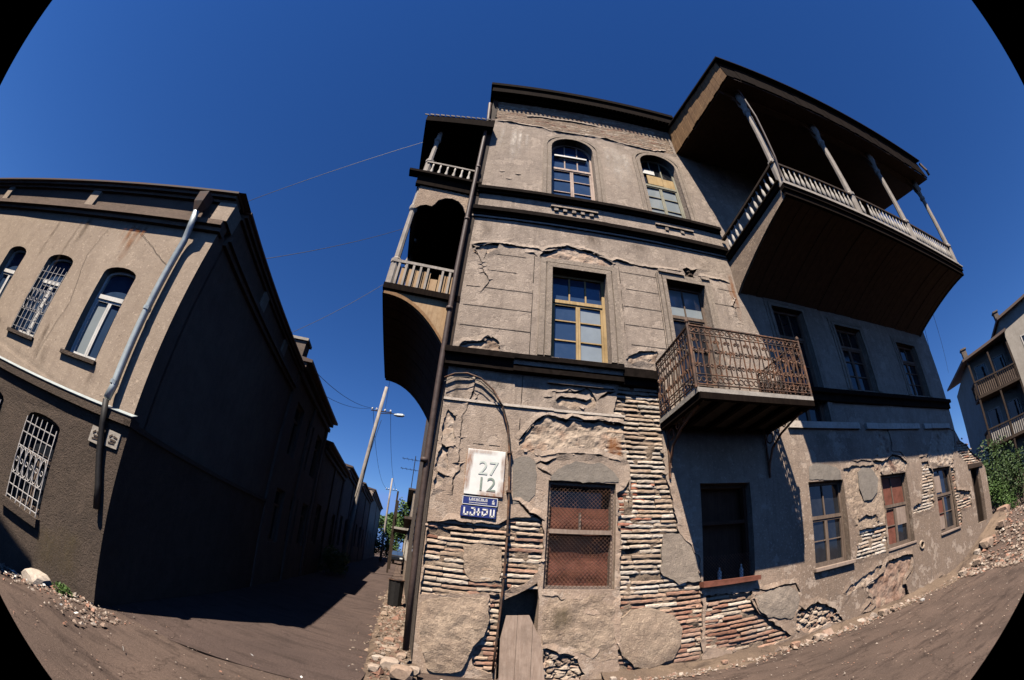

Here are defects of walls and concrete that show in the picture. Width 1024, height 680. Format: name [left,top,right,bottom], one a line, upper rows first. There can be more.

flaking render [460,337,501,351]
crack [470,240,737,317]
flaking render [417,511,548,674]
flaking render [519,385,1024,680]